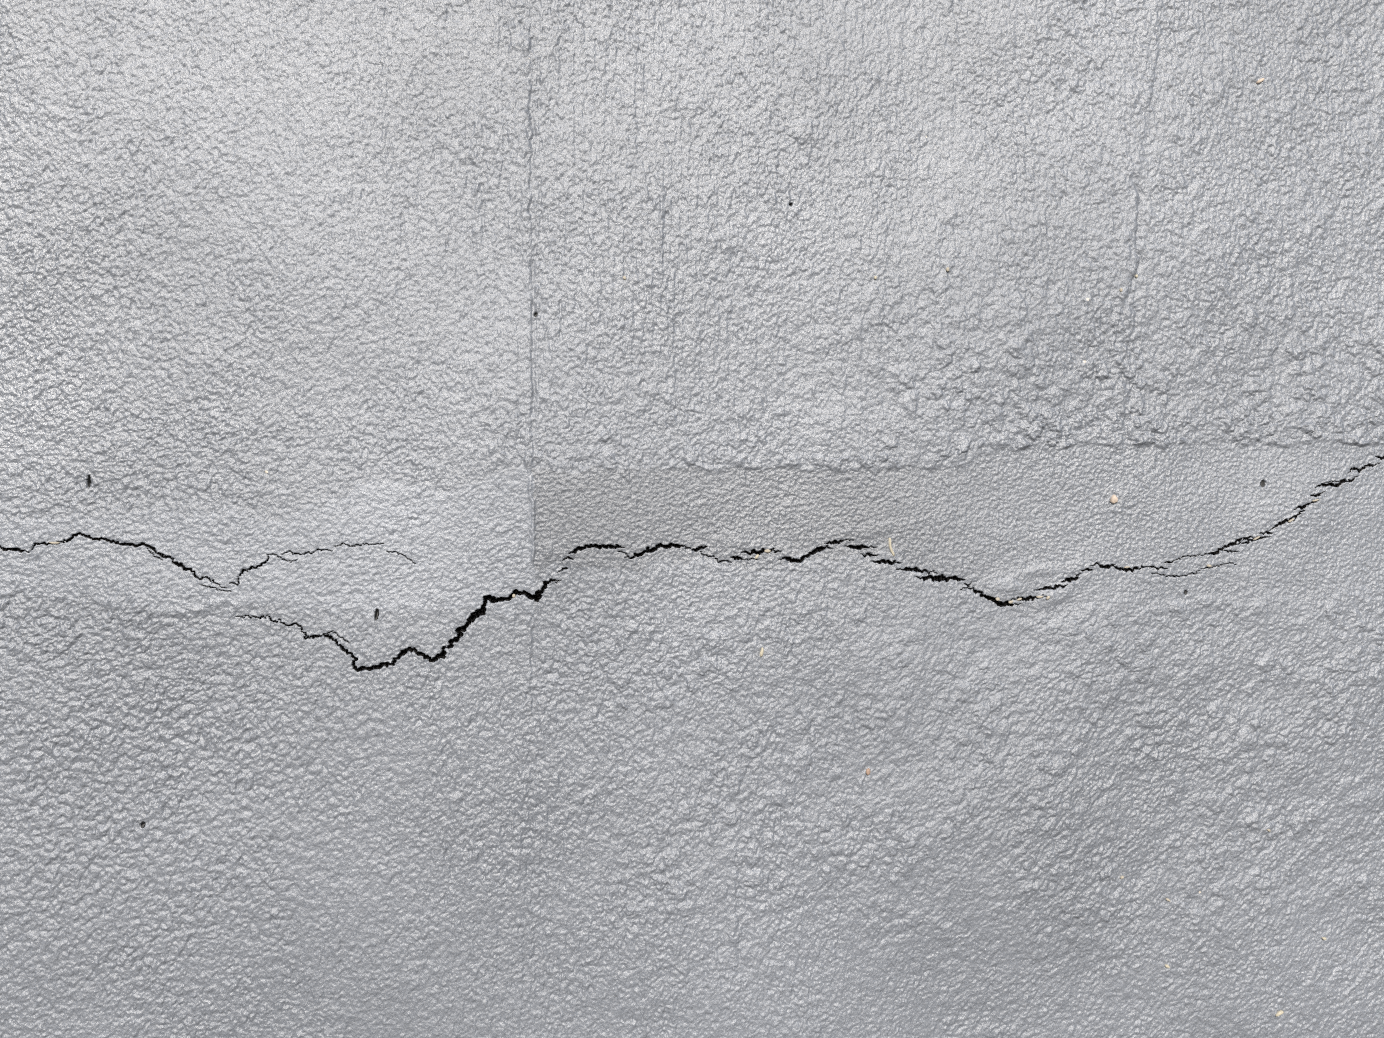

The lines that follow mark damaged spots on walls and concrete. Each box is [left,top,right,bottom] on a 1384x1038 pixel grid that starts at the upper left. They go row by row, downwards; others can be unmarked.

crack [0,456,1384,672]